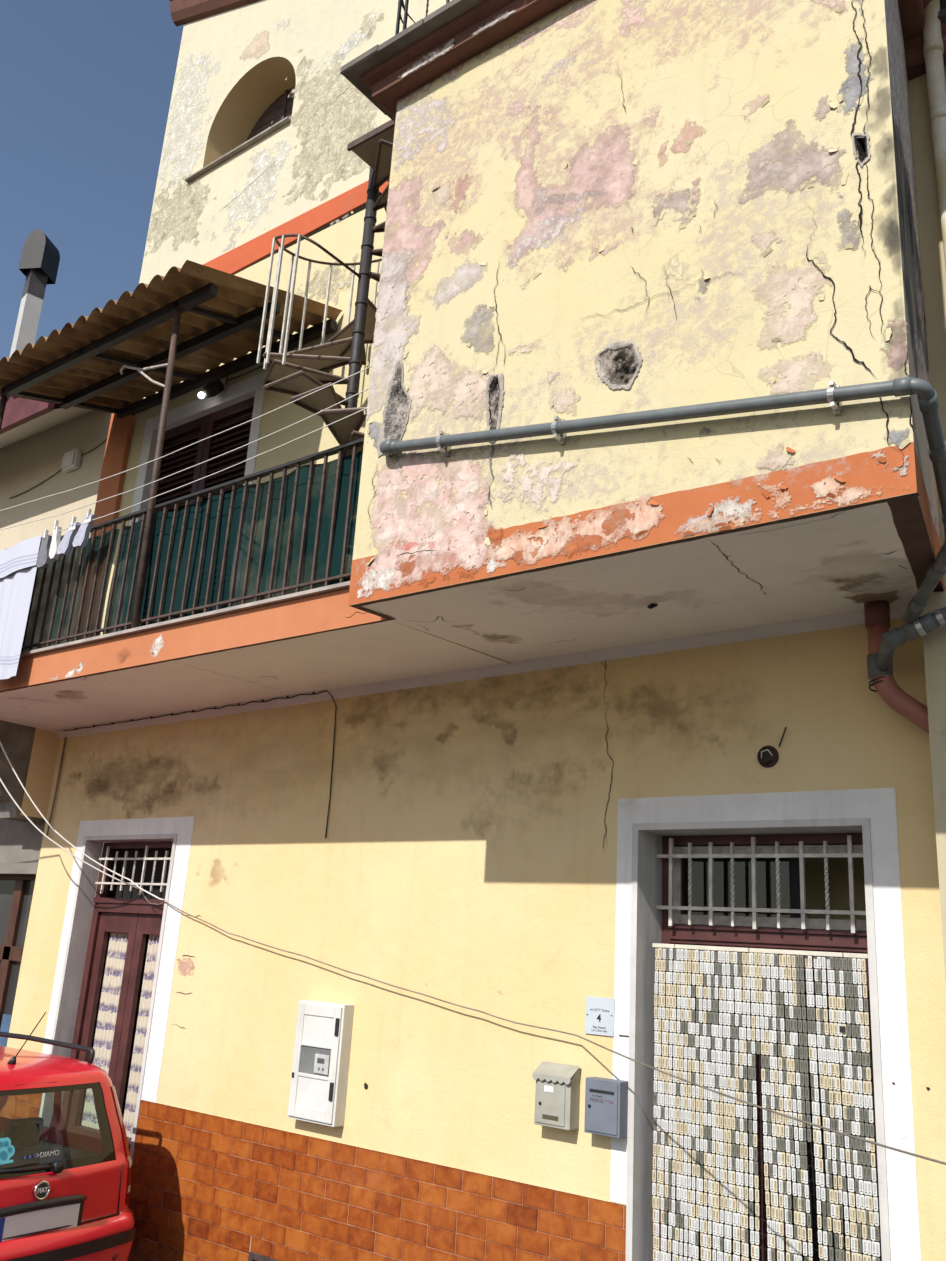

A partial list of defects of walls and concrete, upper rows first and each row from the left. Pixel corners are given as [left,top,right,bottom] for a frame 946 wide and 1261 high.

peeling [146,11,384,255]
crack [493,266,505,370]
peeling [354,0,792,599]
peeling [738,119,871,250]
peeling [812,44,872,121]
crack [806,0,914,461]
peeling [879,0,930,382]
water stain [889,102,929,379]
crack [487,444,495,508]
crack [711,541,766,595]
spalling [678,428,912,538]
crack [601,660,614,849]